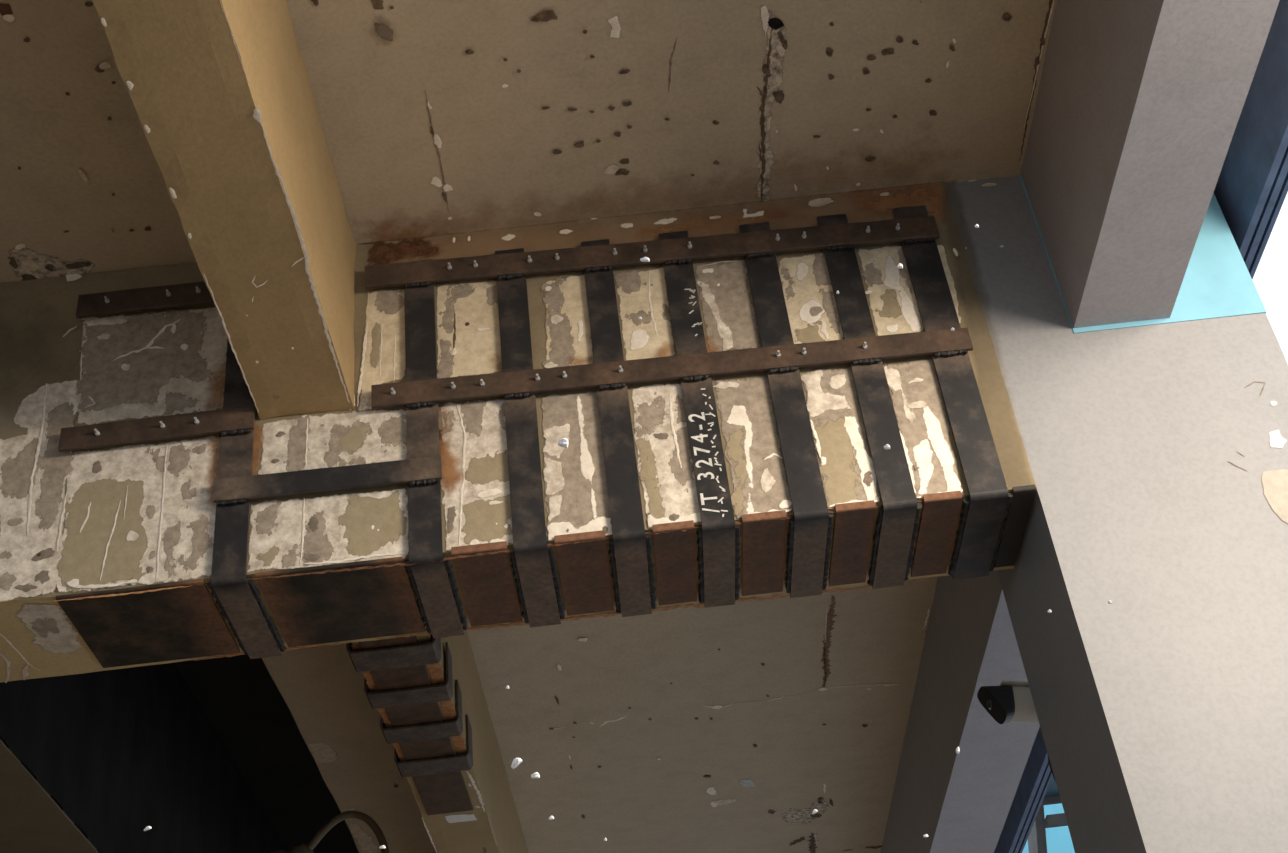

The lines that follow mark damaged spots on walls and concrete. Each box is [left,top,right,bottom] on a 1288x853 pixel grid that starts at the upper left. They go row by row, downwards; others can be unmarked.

crack [743,5,788,218]
rust [853,186,941,216]
rust [367,226,444,266]
peeling [1269,430,1287,448]
peeling [1262,469,1288,523]